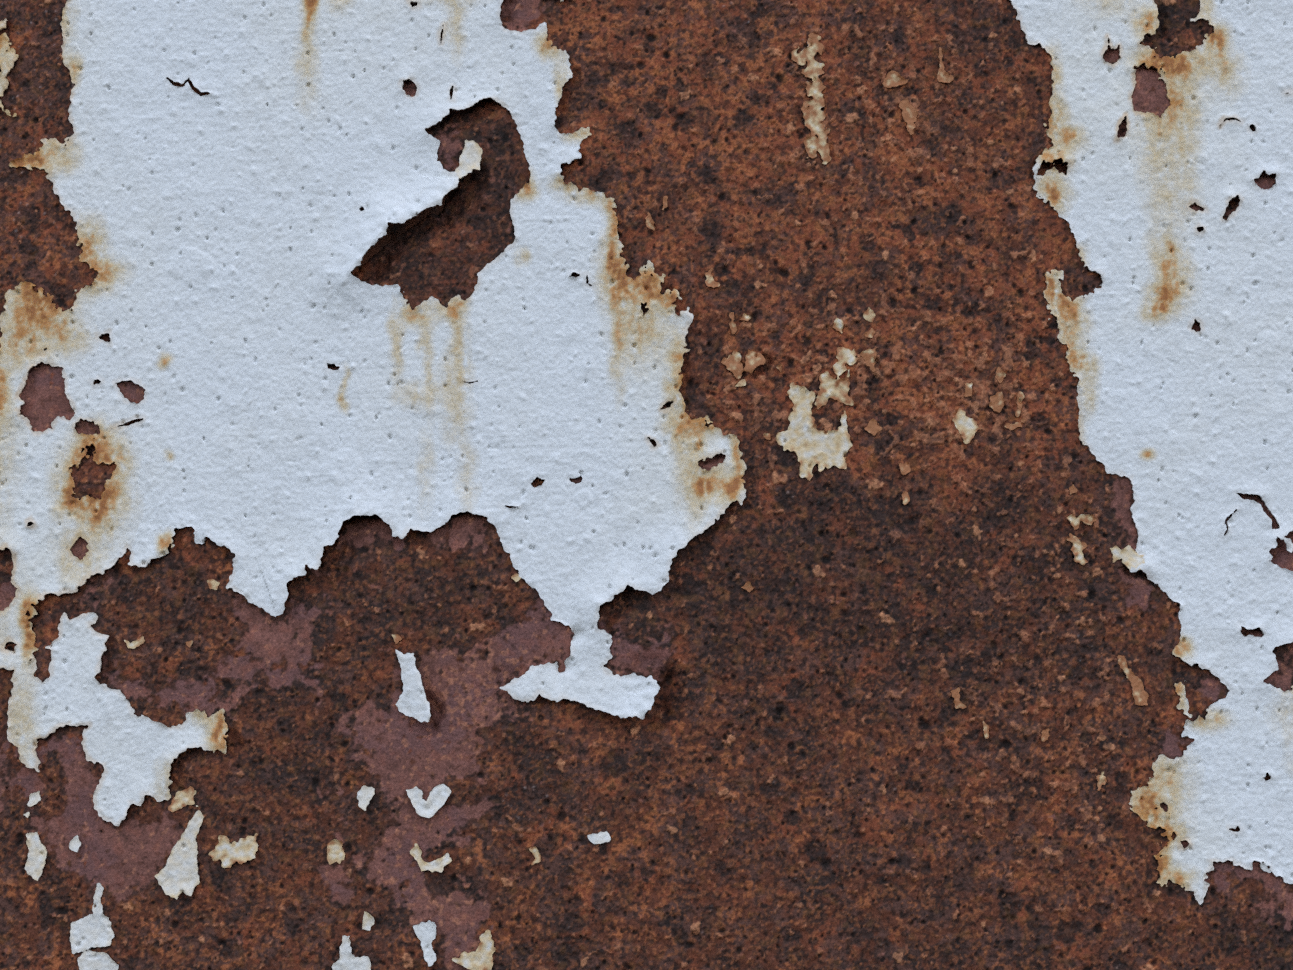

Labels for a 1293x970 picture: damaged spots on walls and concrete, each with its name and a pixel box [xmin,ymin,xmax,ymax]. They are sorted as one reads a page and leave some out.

rust [0,0,118,417]
rust [60,426,127,534]
peeling [0,493,666,970]
rust [495,0,1230,970]
peeling [1198,860,1293,970]
rust [1258,622,1293,692]